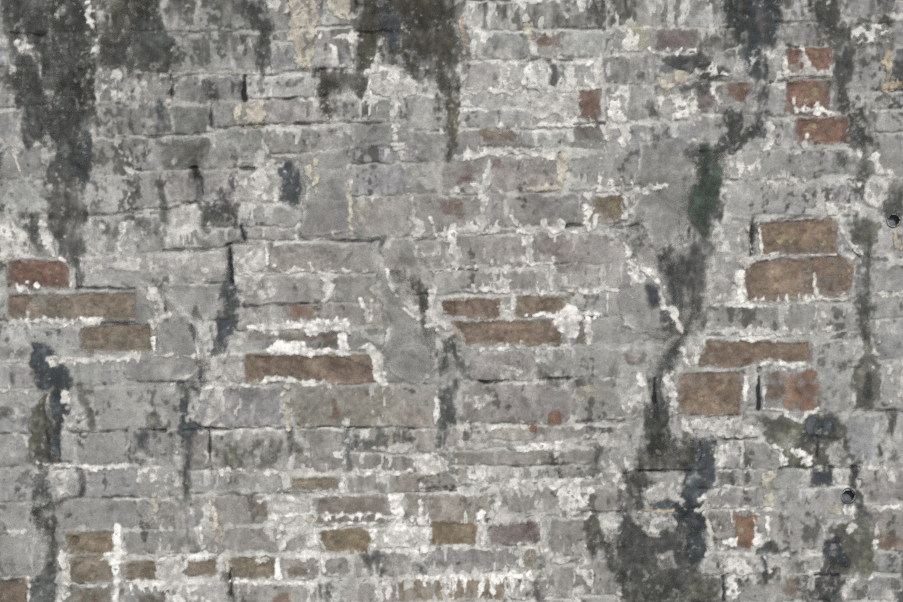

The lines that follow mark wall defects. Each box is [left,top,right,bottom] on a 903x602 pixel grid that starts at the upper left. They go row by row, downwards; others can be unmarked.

spalling [788,80,846,143]
leakage [242,0,643,370]
spalling [746,218,853,300]
peeling [9,260,202,385]
spalling [439,298,562,345]
leakage [415,0,903,602]
spalling [245,354,374,382]
spalling [677,341,808,416]
leakage [319,379,457,498]
spalling [66,530,114,581]
leakage [100,523,214,602]
leakage [199,441,431,600]